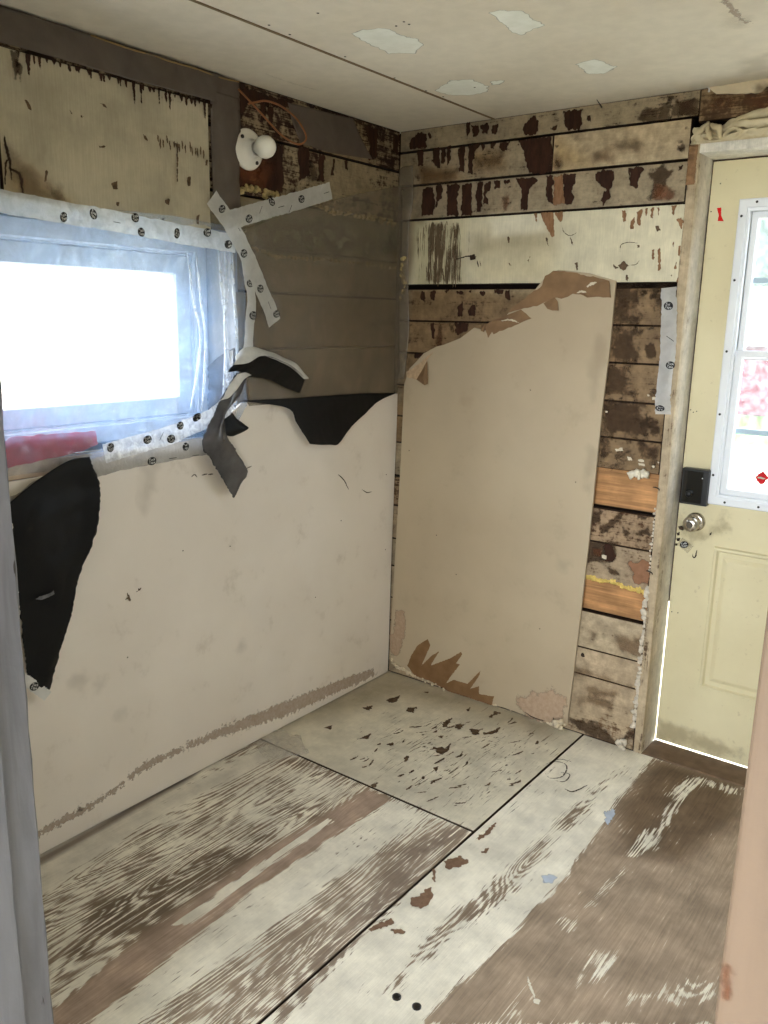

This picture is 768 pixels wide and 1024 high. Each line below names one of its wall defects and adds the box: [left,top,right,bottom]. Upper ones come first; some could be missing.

peeling [10,50,212,119]
peeling [239,86,288,123]
peeling [143,134,208,186]
peeling [264,144,284,193]
peeling [297,147,348,182]
peeling [365,124,378,160]
peeling [595,169,614,206]
peeling [622,163,684,232]
peeling [393,109,591,346]
peeling [652,242,681,282]
spalling [391,658,445,693]
peeling [350,704,519,801]